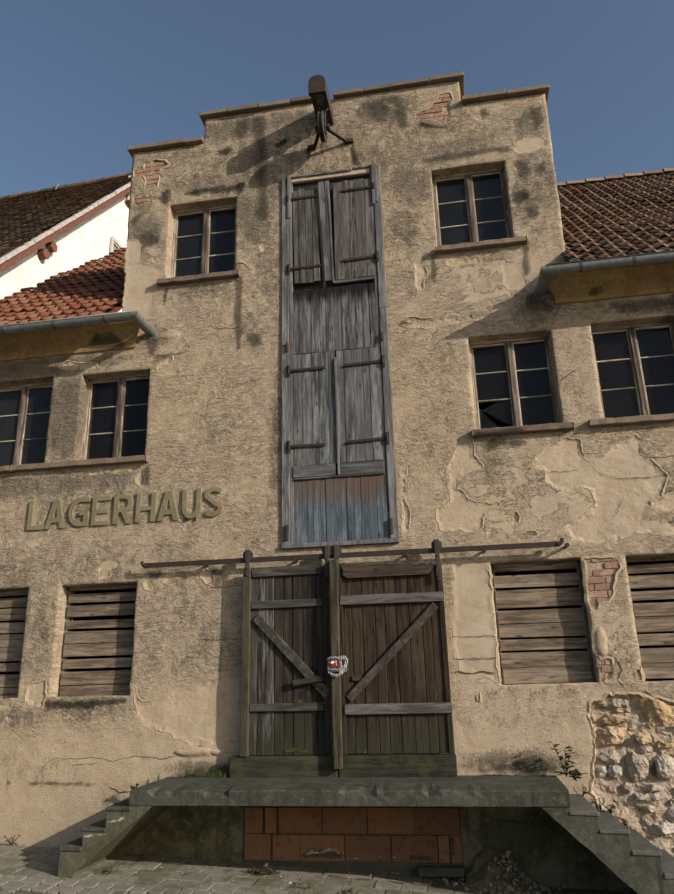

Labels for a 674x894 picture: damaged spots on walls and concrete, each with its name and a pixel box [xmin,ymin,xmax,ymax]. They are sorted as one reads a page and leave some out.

flaking render [414,91,455,122]
flaking render [131,159,170,204]
water stain [238,117,266,218]
water stain [235,279,261,347]
peeling [434,433,501,538]
peeling [530,433,674,543]
spalling [510,510,539,543]
flaking render [581,555,622,613]
water stain [44,698,126,709]
crack [42,755,178,772]
water stain [481,756,557,773]
flaking render [586,666,674,857]